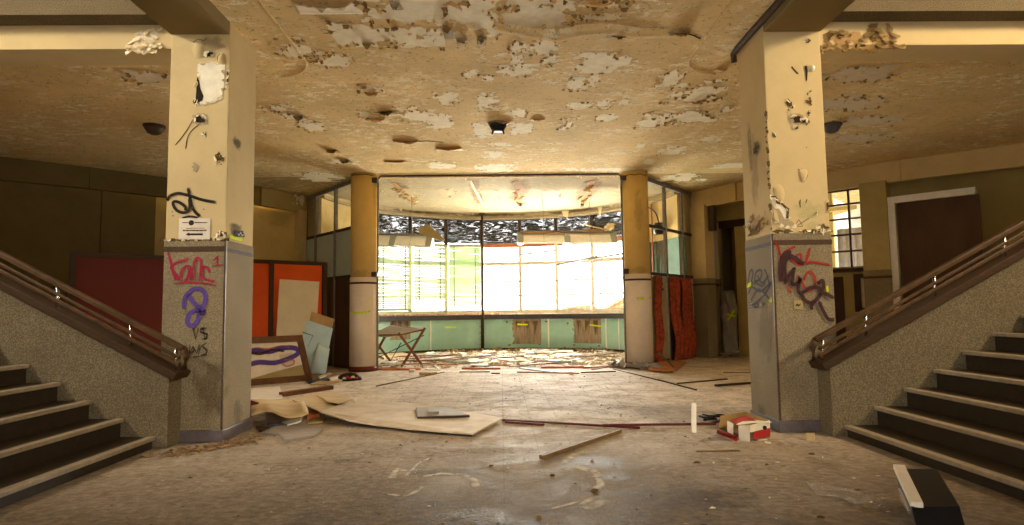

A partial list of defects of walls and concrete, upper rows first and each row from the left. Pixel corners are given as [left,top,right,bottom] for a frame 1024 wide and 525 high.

peeling [125,28,162,55]
peeling [192,51,230,138]
peeling [259,0,635,199]
peeling [632,69,739,129]
peeling [786,23,914,130]
peeling [743,111,833,237]